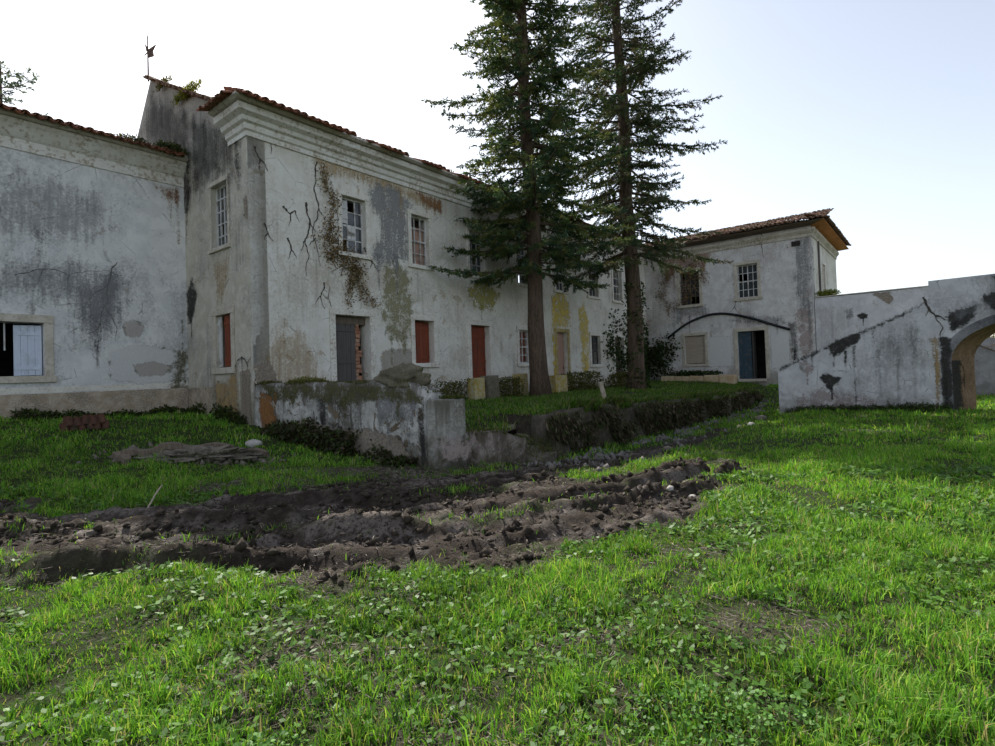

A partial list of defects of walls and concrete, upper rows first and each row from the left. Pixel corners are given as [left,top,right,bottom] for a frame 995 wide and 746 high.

leakage [143,83,241,236]
leakage [0,263,118,332]
leakage [182,279,197,337]
leakage [795,238,812,330]
crack [922,297,957,335]
peeling [107,326,192,391]
leakage [170,350,188,389]
spalling [205,362,278,425]
leakage [797,292,995,411]